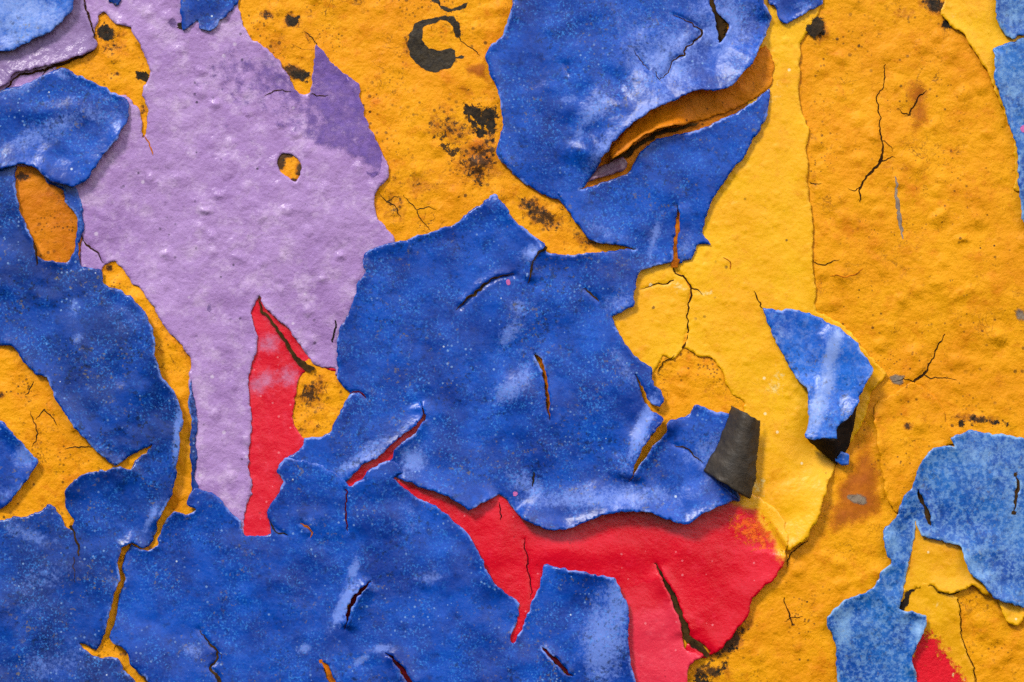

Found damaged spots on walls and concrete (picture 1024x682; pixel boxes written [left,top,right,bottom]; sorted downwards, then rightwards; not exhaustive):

peeling [0,0,151,263]
leakage [433,130,483,186]
leakage [463,102,500,138]
crack [852,64,926,202]
peeling [0,345,152,530]
peeling [79,261,199,682]
peeling [292,359,350,438]
crack [644,267,702,373]
peeling [629,333,760,499]
peeling [874,382,958,513]
crack [892,334,955,383]
peeling [620,571,704,682]